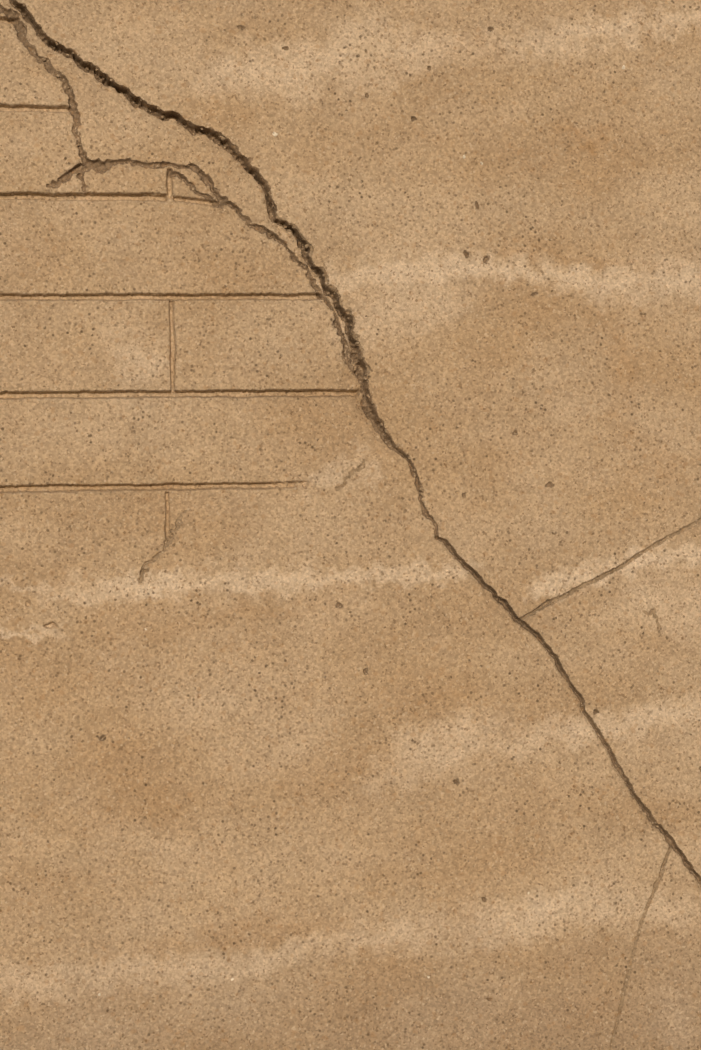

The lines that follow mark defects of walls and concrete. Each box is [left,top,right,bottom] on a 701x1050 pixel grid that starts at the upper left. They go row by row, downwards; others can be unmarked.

crack [0,0,442,540]
crack [137,510,187,583]
crack [438,517,701,1050]